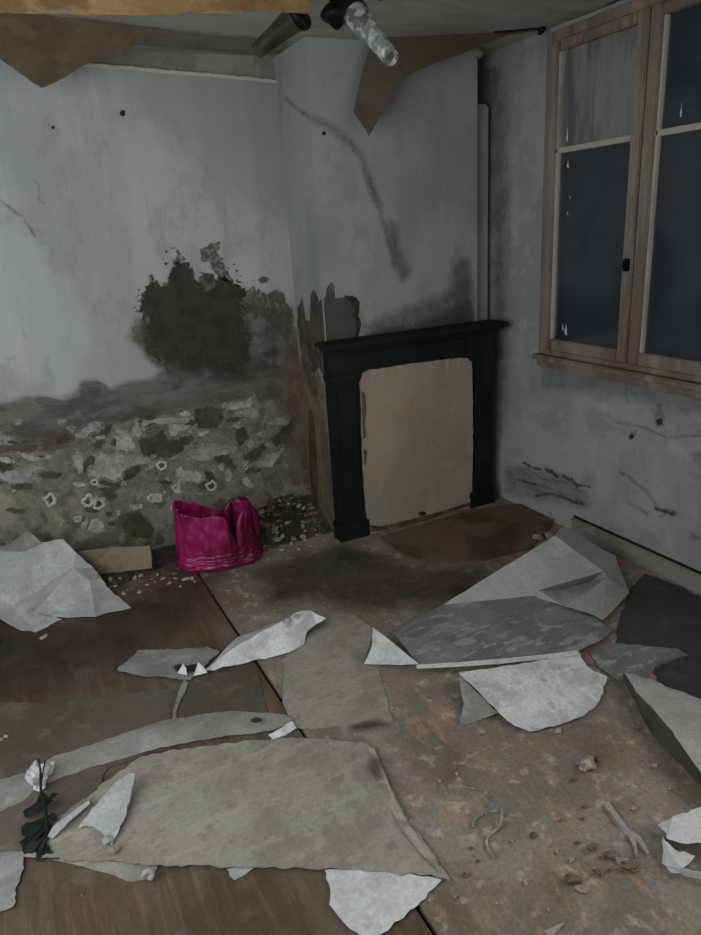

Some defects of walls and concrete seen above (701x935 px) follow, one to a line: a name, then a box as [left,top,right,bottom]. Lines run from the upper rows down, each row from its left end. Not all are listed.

peeling [0,393,307,538]
water stain [0,239,334,563]
crack [518,462,590,506]
crack [655,507,676,516]